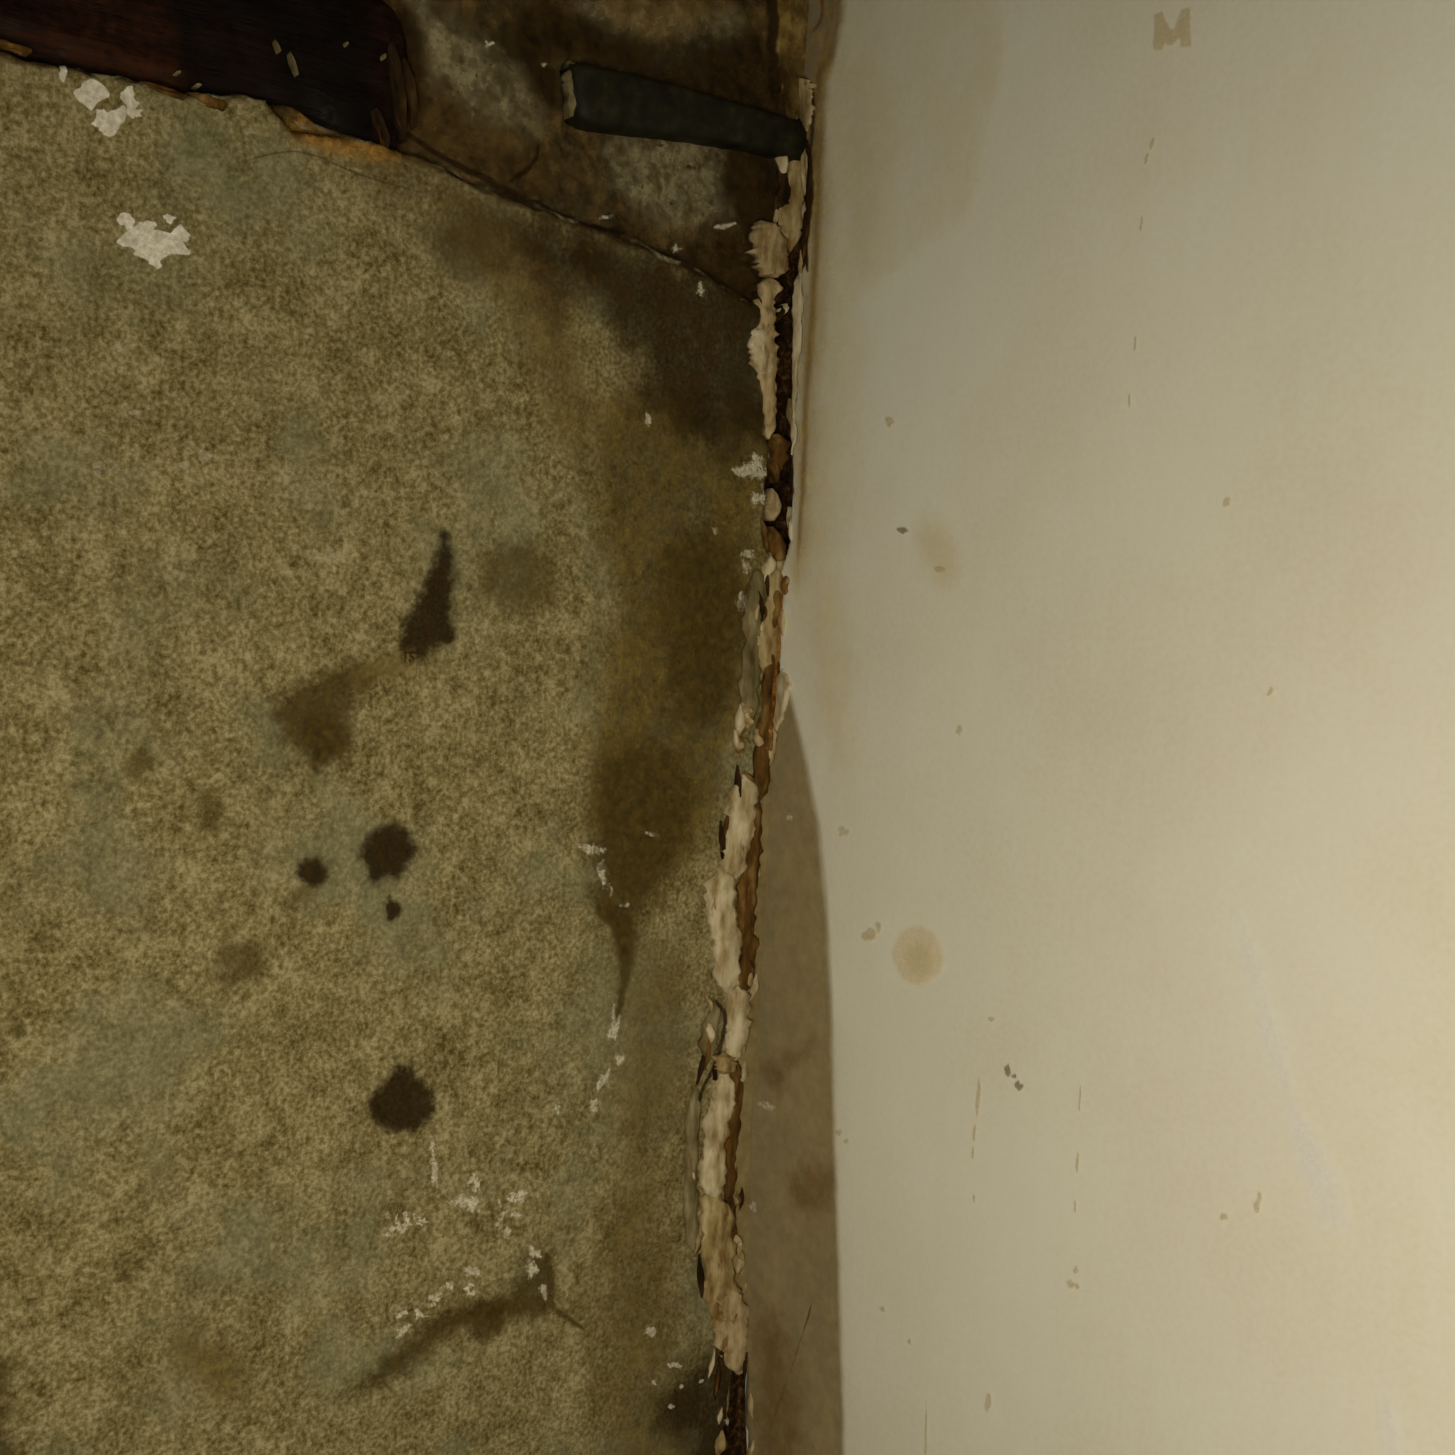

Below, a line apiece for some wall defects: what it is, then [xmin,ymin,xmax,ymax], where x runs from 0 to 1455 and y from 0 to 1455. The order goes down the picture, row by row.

leakage [473,149,780,1020]
leakage [274,530,454,768]
peeling [204,0,842,1455]
leakage [298,858,327,893]
leakage [360,824,417,882]
leakage [386,896,401,921]
leakage [370,1065,435,1133]
leakage [385,1212,425,1236]
leakage [452,1173,480,1213]
leakage [496,1190,526,1235]